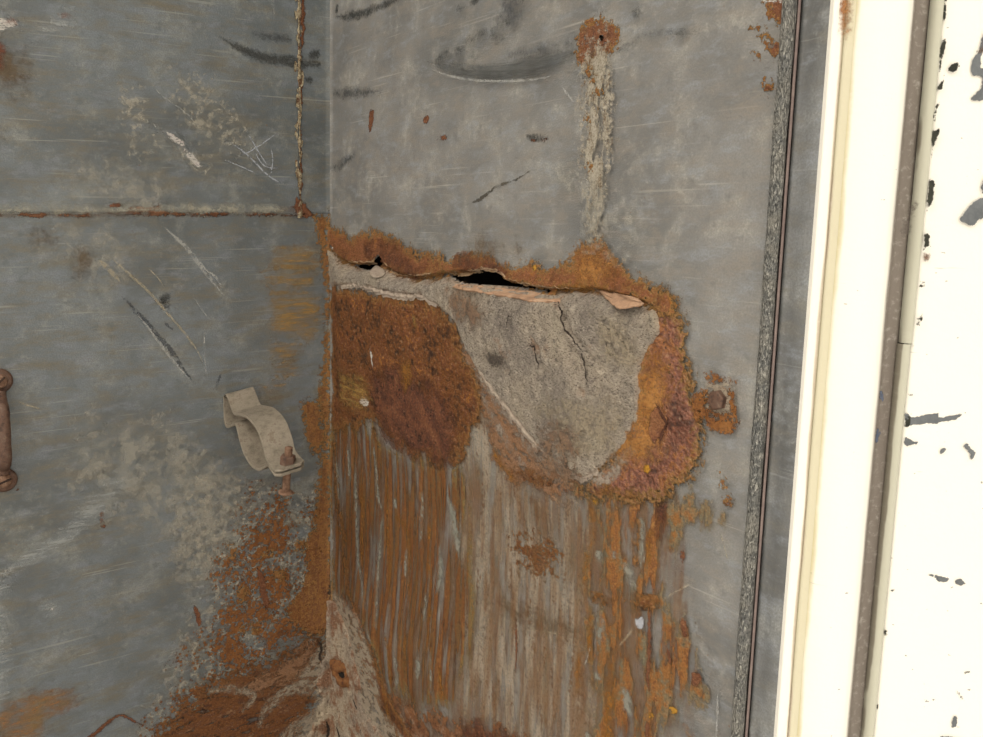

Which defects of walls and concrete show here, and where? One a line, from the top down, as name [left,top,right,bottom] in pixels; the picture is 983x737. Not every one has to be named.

rust [573,13,620,66]
rust [748,0,782,61]
peeling [937,37,983,101]
water stain [566,36,617,243]
peeling [931,104,940,155]
peeling [927,180,935,207]
peeling [960,184,983,226]
crack [345,258,627,385]
spalling [327,248,660,488]
rust [88,130,740,737]